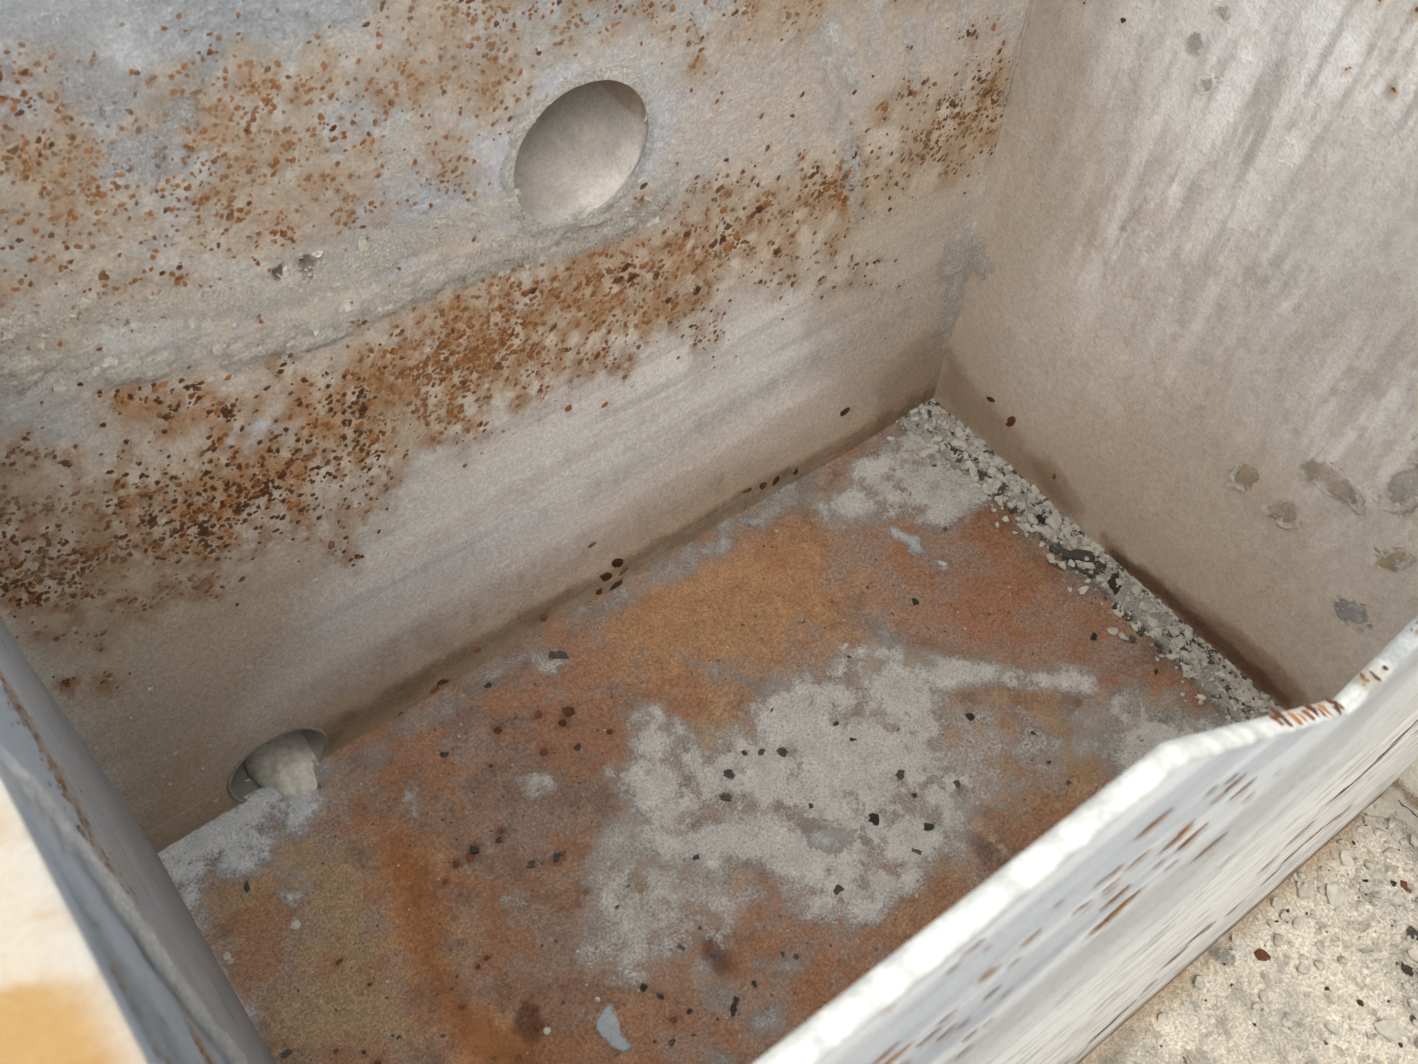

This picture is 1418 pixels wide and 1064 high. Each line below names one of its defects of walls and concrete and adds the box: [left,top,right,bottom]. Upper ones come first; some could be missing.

corrosion [0,0,1010,652]
corrosion [0,676,138,911]
corrosion [52,671,132,689]
corrosion [442,828,504,884]
corrosion [534,707,574,727]
damp [576,609,1237,1009]
corrosion [873,1011,994,1064]
corrosion [979,928,1043,999]
corrosion [1110,550,1344,727]
corrosion [1053,721,1418,1064]